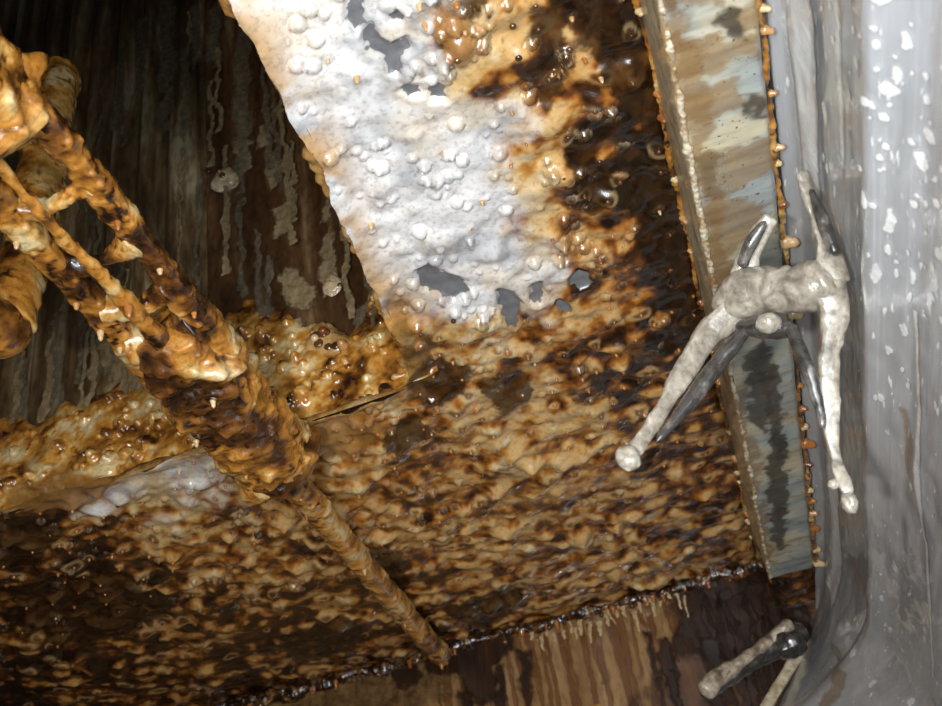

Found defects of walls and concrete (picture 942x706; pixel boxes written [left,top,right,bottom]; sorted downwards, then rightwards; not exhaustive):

peeling [347,0,410,73]
water stain [458,0,487,22]
peeling [400,83,446,97]
water stain [157,0,377,327]
corrosion [631,0,705,318]
corrosion [755,0,790,266]
peeling [417,264,469,298]
peeling [497,281,543,327]
peeling [569,269,593,290]
corrosion [7,472,120,514]
water stain [529,592,689,651]
corrosion [490,599,679,706]